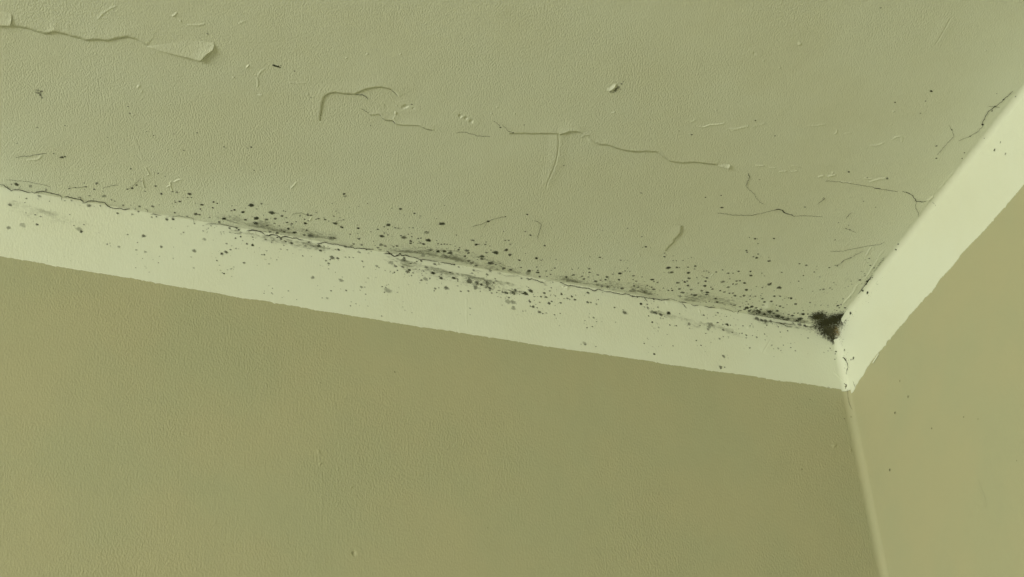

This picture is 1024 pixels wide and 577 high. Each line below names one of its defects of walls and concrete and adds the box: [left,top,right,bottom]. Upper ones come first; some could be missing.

peeling [0,8,214,62]
crack [0,153,455,265]
damp [126,173,658,323]
damp [663,253,854,359]